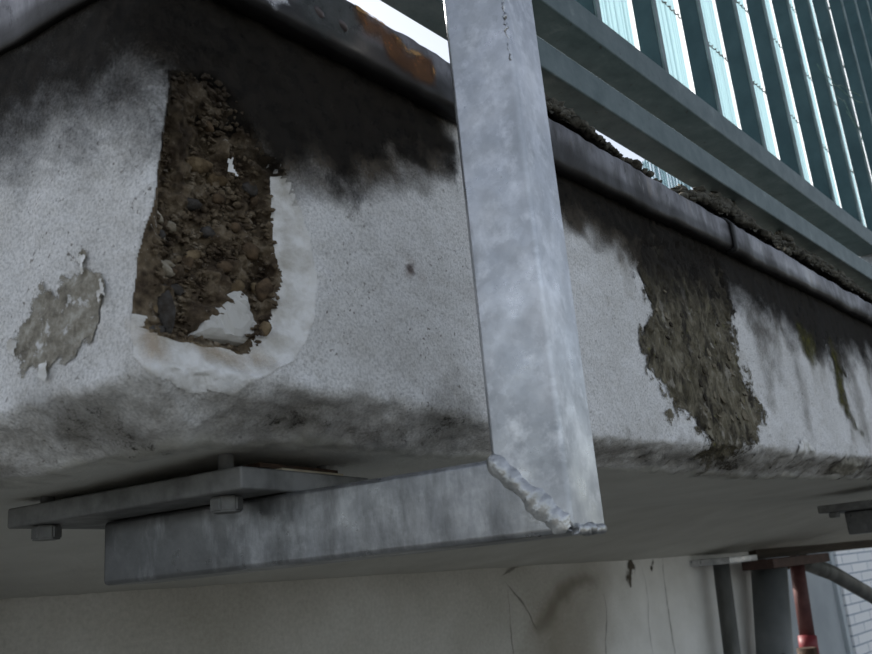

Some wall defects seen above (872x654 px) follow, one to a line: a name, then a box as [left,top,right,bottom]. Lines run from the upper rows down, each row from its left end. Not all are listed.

damp [0,0,458,200]
rust [356,5,435,84]
flaking render [6,248,105,381]
spalling [130,69,319,396]
flaking render [633,235,768,477]
damp [556,174,872,435]